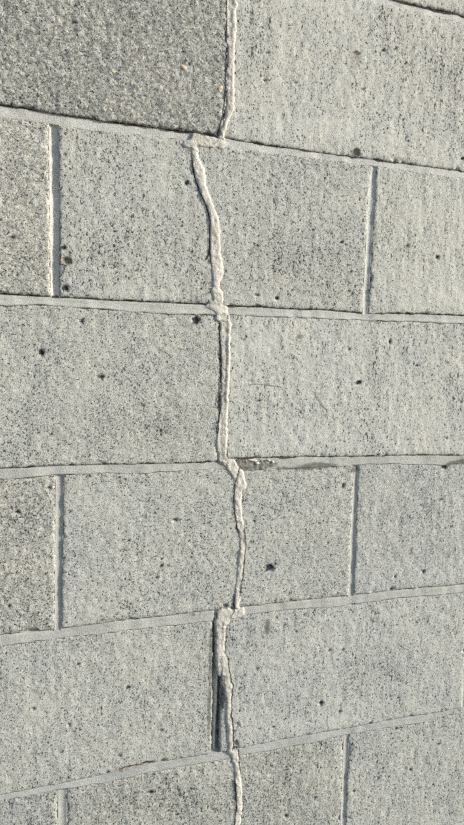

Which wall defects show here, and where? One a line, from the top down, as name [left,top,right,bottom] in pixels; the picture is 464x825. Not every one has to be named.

crack [182,0,246,825]